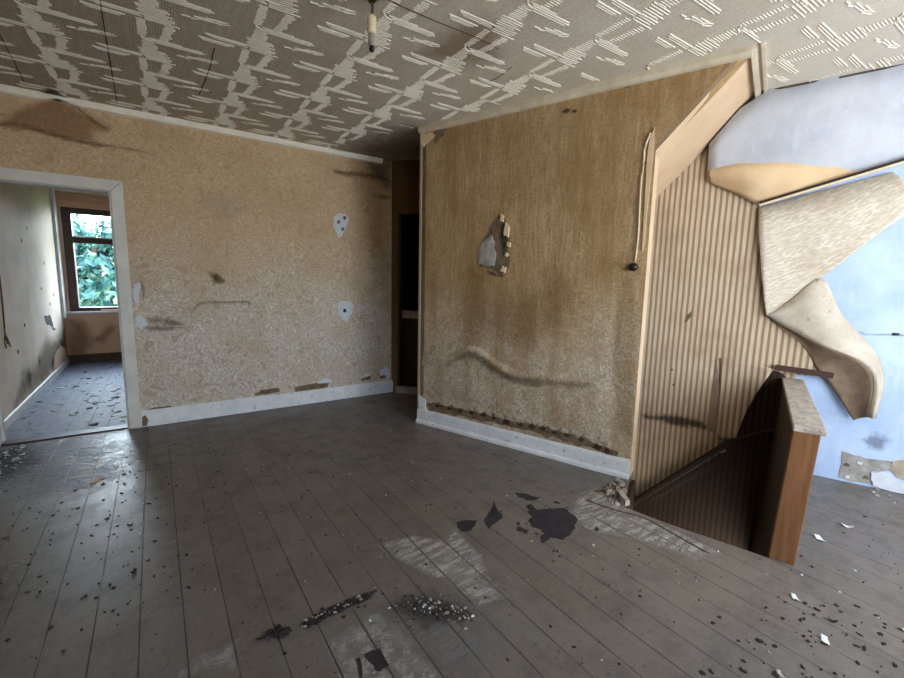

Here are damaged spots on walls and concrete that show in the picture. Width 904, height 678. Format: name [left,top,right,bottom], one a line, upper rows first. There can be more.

flaking render [333,213,349,239]
flaking render [478,214,511,275]
peeling [839,451,904,494]